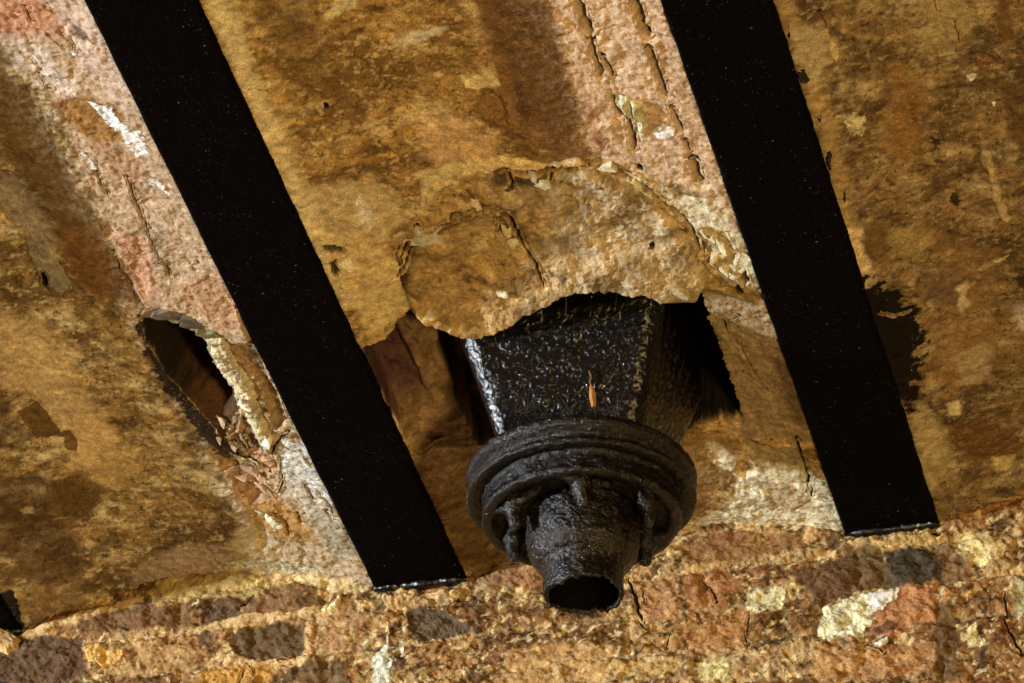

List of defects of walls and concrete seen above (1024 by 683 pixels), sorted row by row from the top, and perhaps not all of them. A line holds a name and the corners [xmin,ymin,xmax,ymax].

crack [94,170,198,276]
leakage [17,402,78,453]
leakage [47,474,102,524]
peeling [105,225,292,504]
spalling [362,308,495,452]
spalling [685,291,745,432]
crack [792,436,816,497]